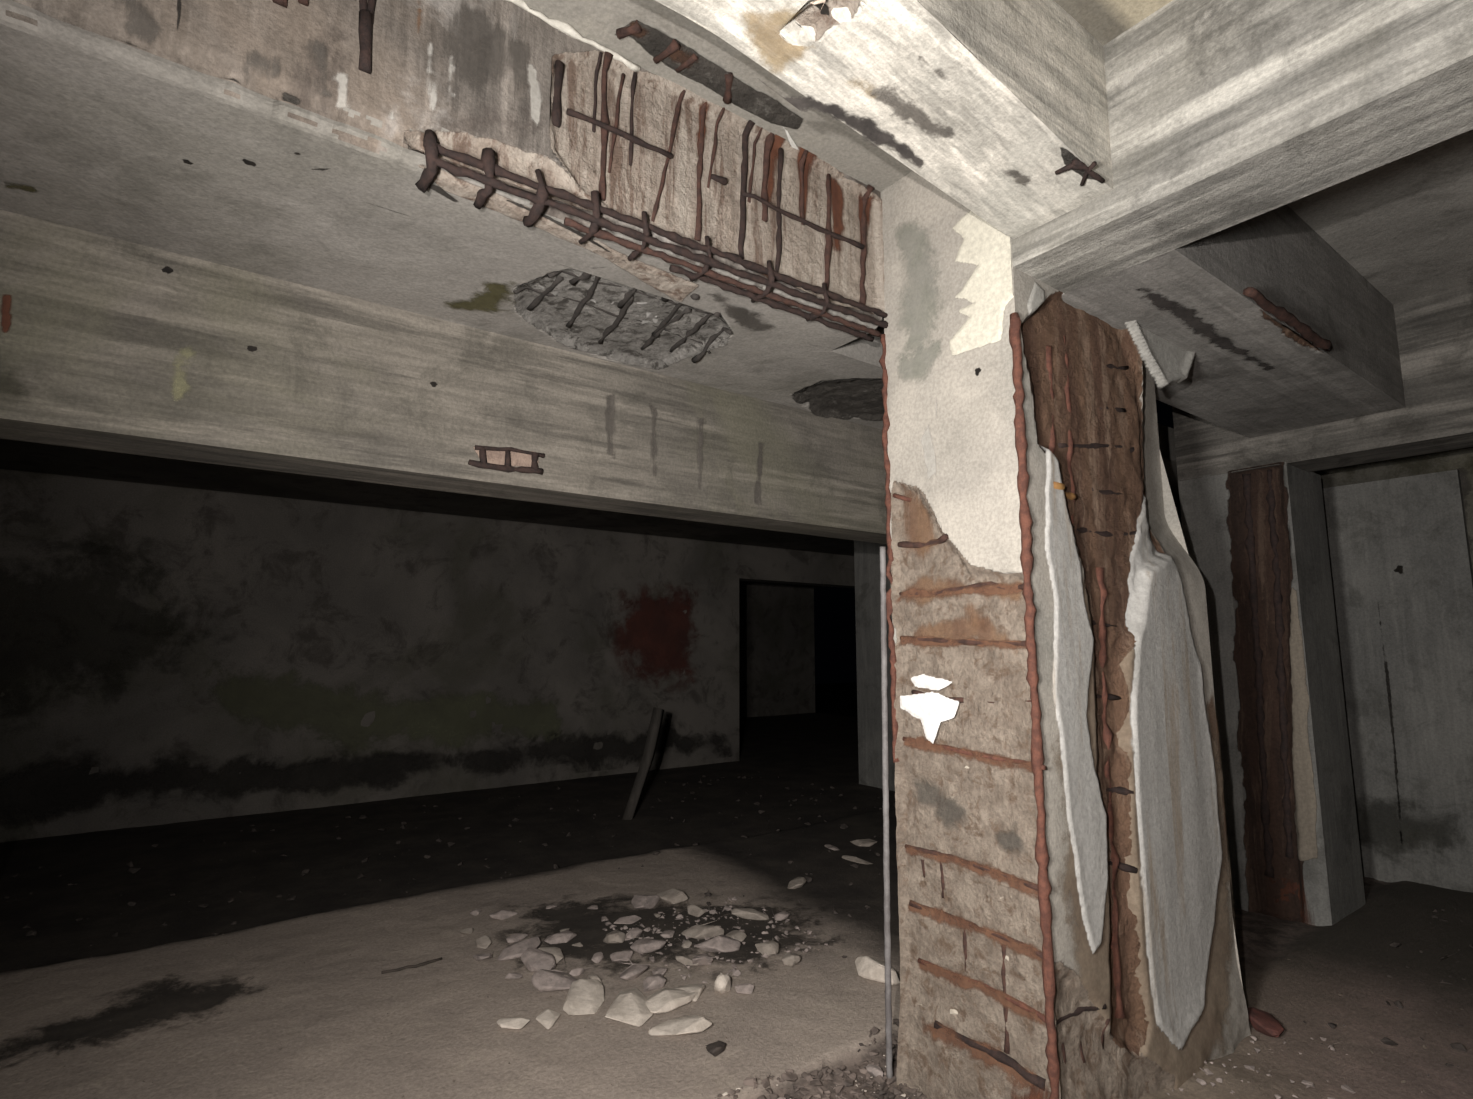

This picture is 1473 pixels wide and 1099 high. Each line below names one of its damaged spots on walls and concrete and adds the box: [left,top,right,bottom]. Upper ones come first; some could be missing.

spalling [781,0,860,41]
spalling [404,20,1223,1099]
spalling [1226,462,1318,923]